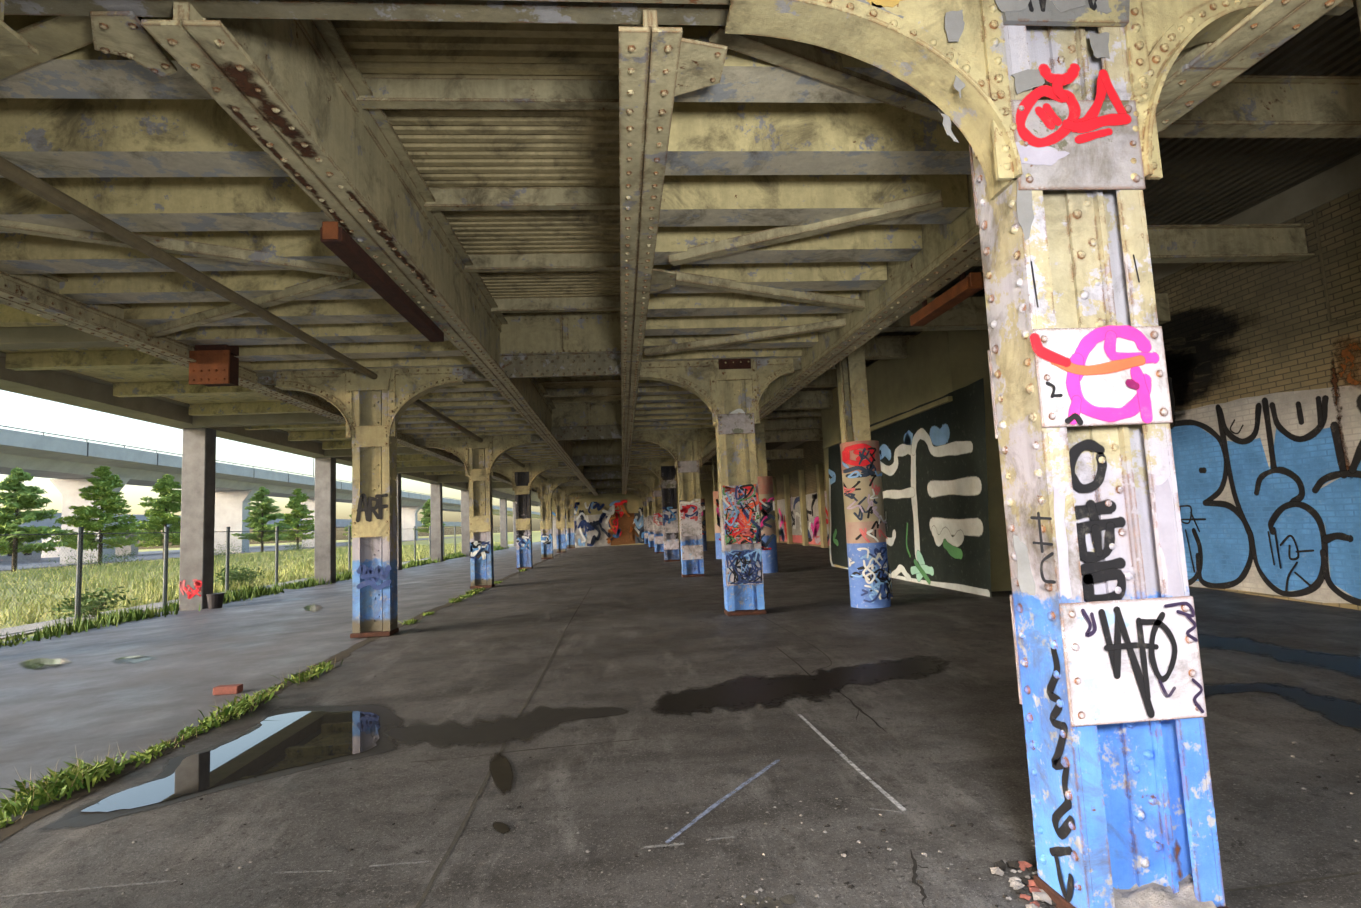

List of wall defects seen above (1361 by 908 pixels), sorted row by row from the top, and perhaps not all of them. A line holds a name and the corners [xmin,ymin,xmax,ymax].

rust [222,63,353,237]
rust [347,191,436,296]
leakage [385,706,627,748]
leakage [652,656,949,715]
leakage [1198,634,1361,678]
leakage [1203,682,1361,731]